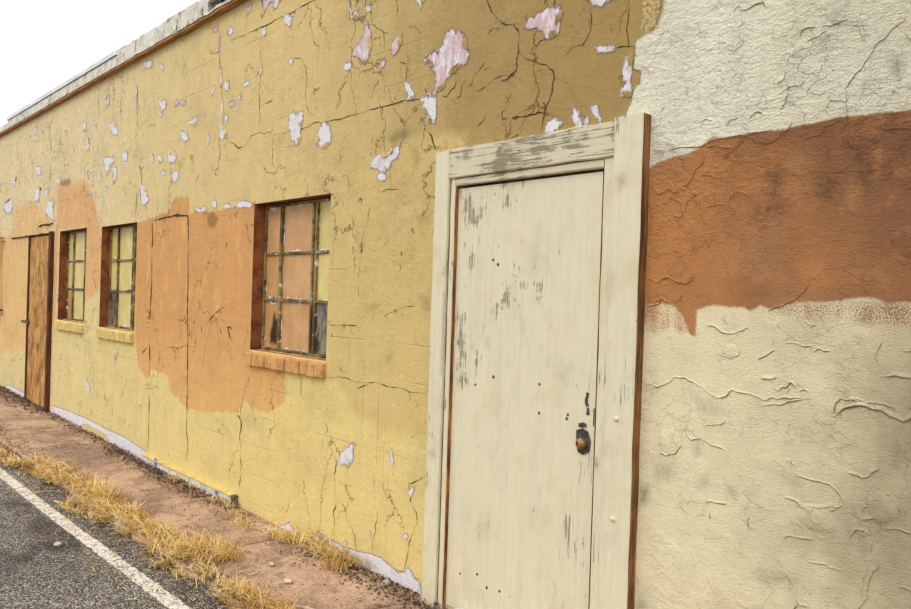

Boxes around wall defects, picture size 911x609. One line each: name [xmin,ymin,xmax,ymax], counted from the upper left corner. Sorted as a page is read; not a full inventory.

peeling [522,4,563,39]
crack [617,9,634,48]
peeling [404,27,470,124]
peeling [618,53,634,98]
peeling [370,145,400,181]
crack [218,0,592,293]
peeling [543,103,602,133]
crack [149,214,189,319]
crack [172,289,232,380]
peeling [51,405,147,460]
crack [321,419,377,550]
peeling [313,532,422,595]